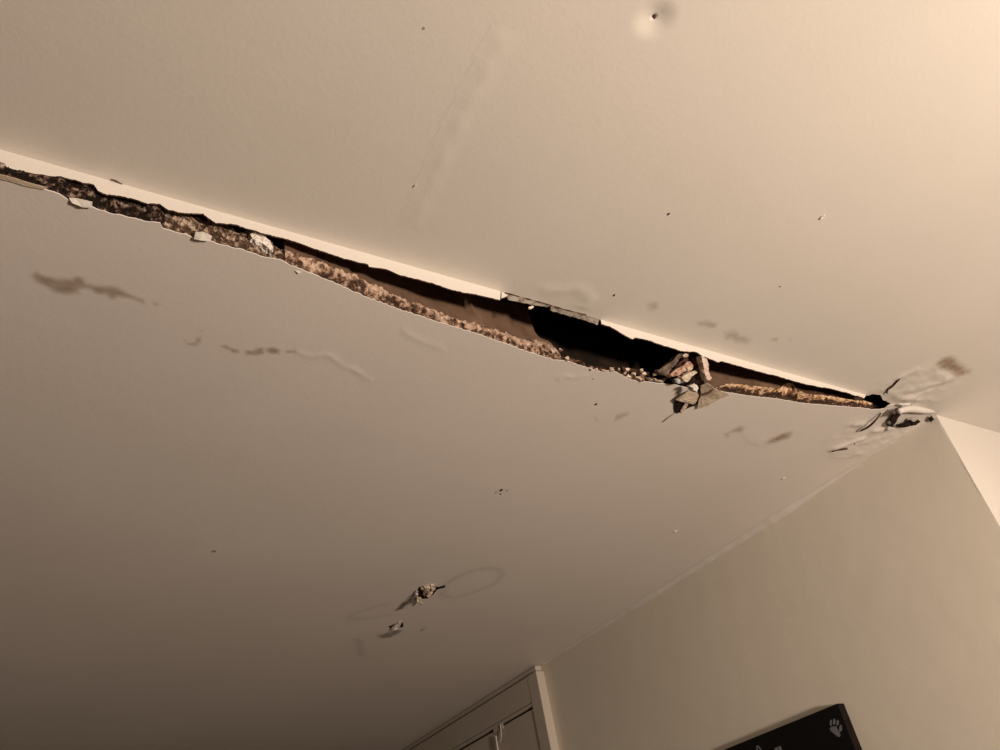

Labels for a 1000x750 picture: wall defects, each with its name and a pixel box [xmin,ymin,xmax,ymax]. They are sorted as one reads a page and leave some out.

flaking render [0,162,679,384]
peeling [684,355,972,464]
flaking render [388,584,445,630]